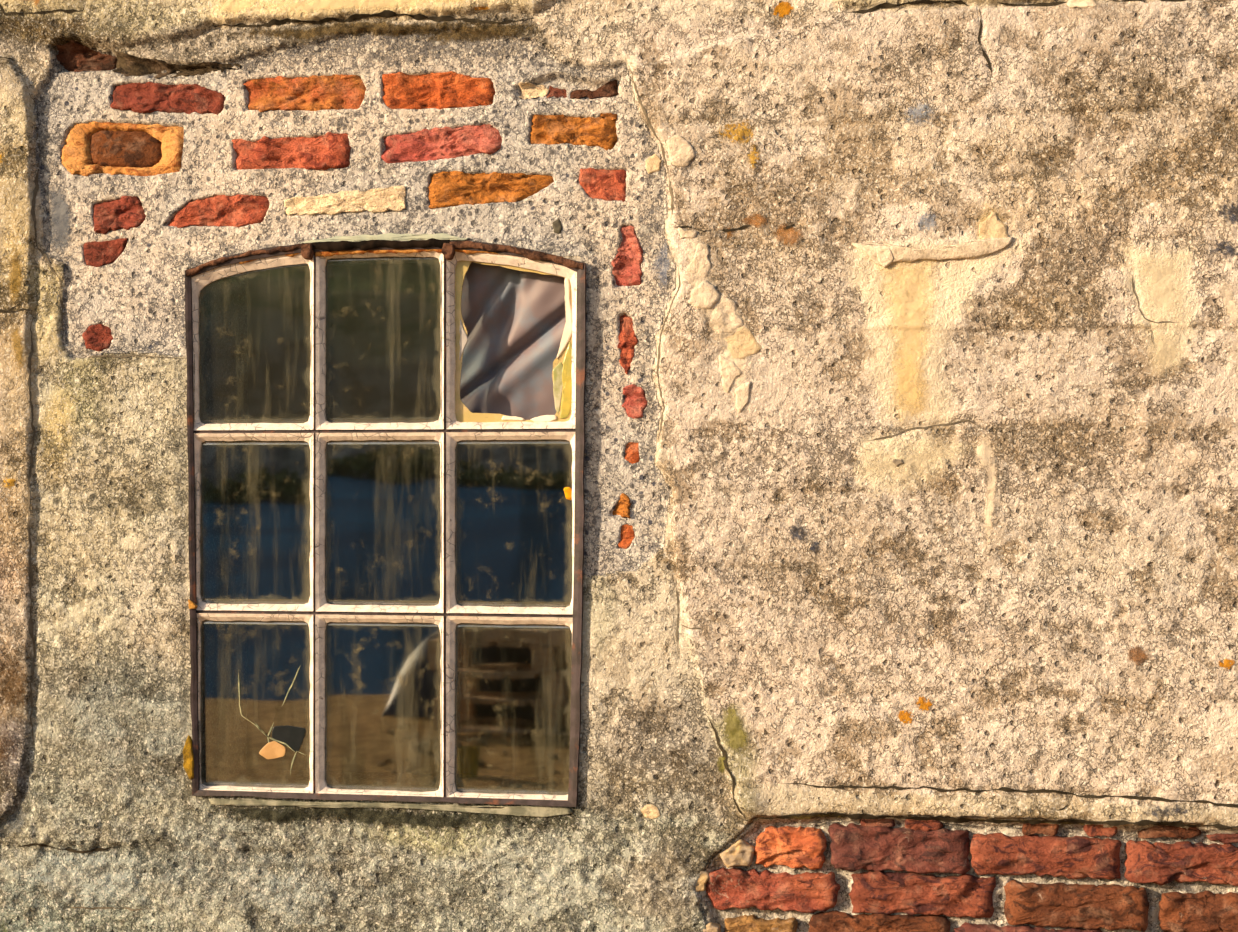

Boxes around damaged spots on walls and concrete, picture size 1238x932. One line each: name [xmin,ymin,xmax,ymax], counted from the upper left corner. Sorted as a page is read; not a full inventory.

crack [852,0,1068,74]
crack [1106,0,1185,8]
crack [630,70,750,232]
flaking render [33,27,762,577]
crack [656,270,680,444]
crack [708,717,1238,829]